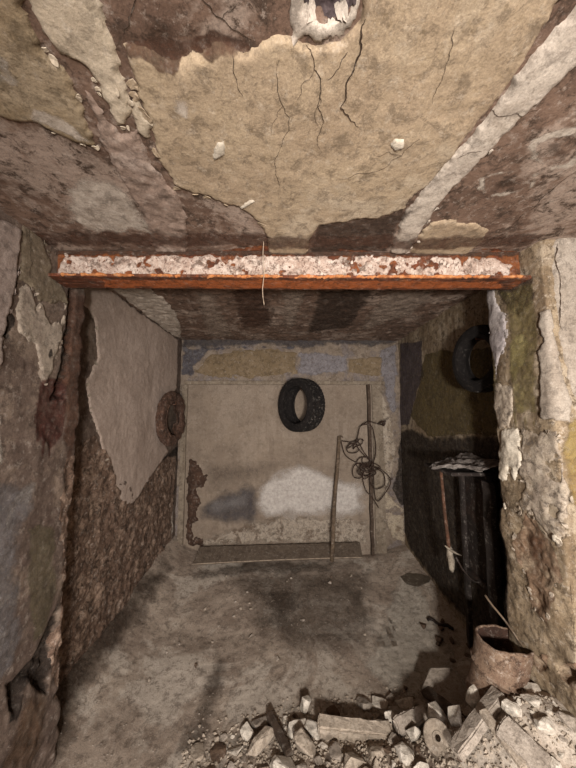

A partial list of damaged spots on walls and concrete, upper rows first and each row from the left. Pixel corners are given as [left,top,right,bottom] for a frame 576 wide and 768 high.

crack [271,19,366,194]
flaking render [0,0,557,385]
water stain [182,289,394,348]
rust [102,279,502,289]
water stain [362,292,428,329]
flaking render [537,238,576,422]
crack [555,244,563,330]
rust [34,379,66,456]
rust [186,459,208,546]
spalling [7,288,515,723]